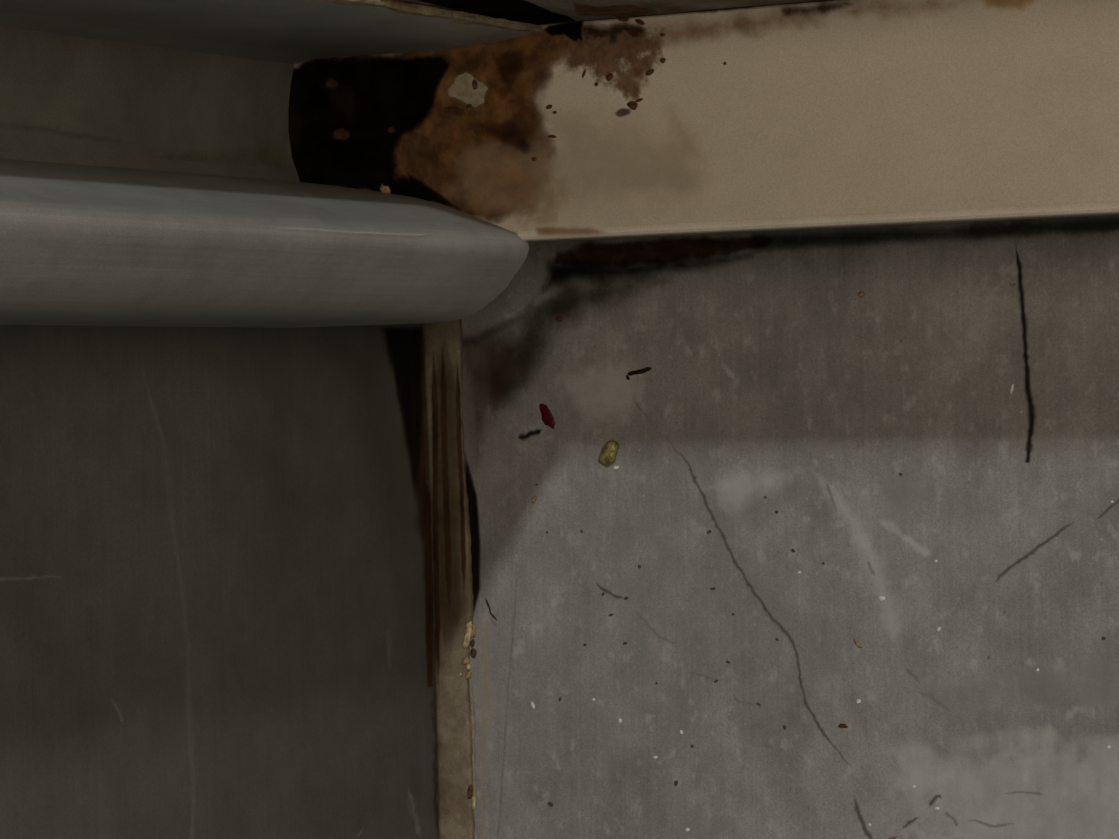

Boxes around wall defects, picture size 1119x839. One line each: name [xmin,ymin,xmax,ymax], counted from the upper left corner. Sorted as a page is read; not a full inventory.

corrosion [985,0,1032,8]
spalling [444,72,488,115]
corrosion [299,3,858,222]
crack [1016,251,1035,463]
crack [996,499,1119,581]
crack [596,583,673,643]
crack [673,447,842,756]
crack [855,795,1007,839]